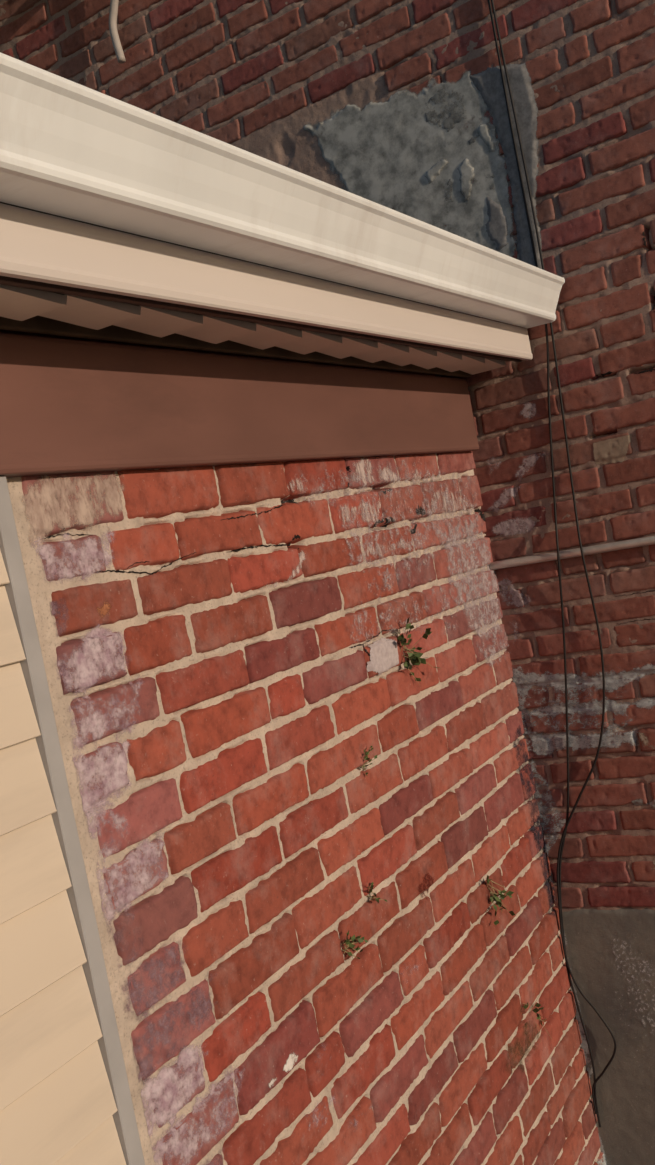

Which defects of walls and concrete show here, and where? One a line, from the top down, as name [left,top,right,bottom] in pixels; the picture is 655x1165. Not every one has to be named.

peeling [303,71,517,257]
water stain [522,403,536,417]
crack [222,504,283,520]
crack [43,528,87,539]
crack [97,552,196,574]
crack [230,544,287,552]
water stain [339,453,544,665]
water stain [512,664,655,854]